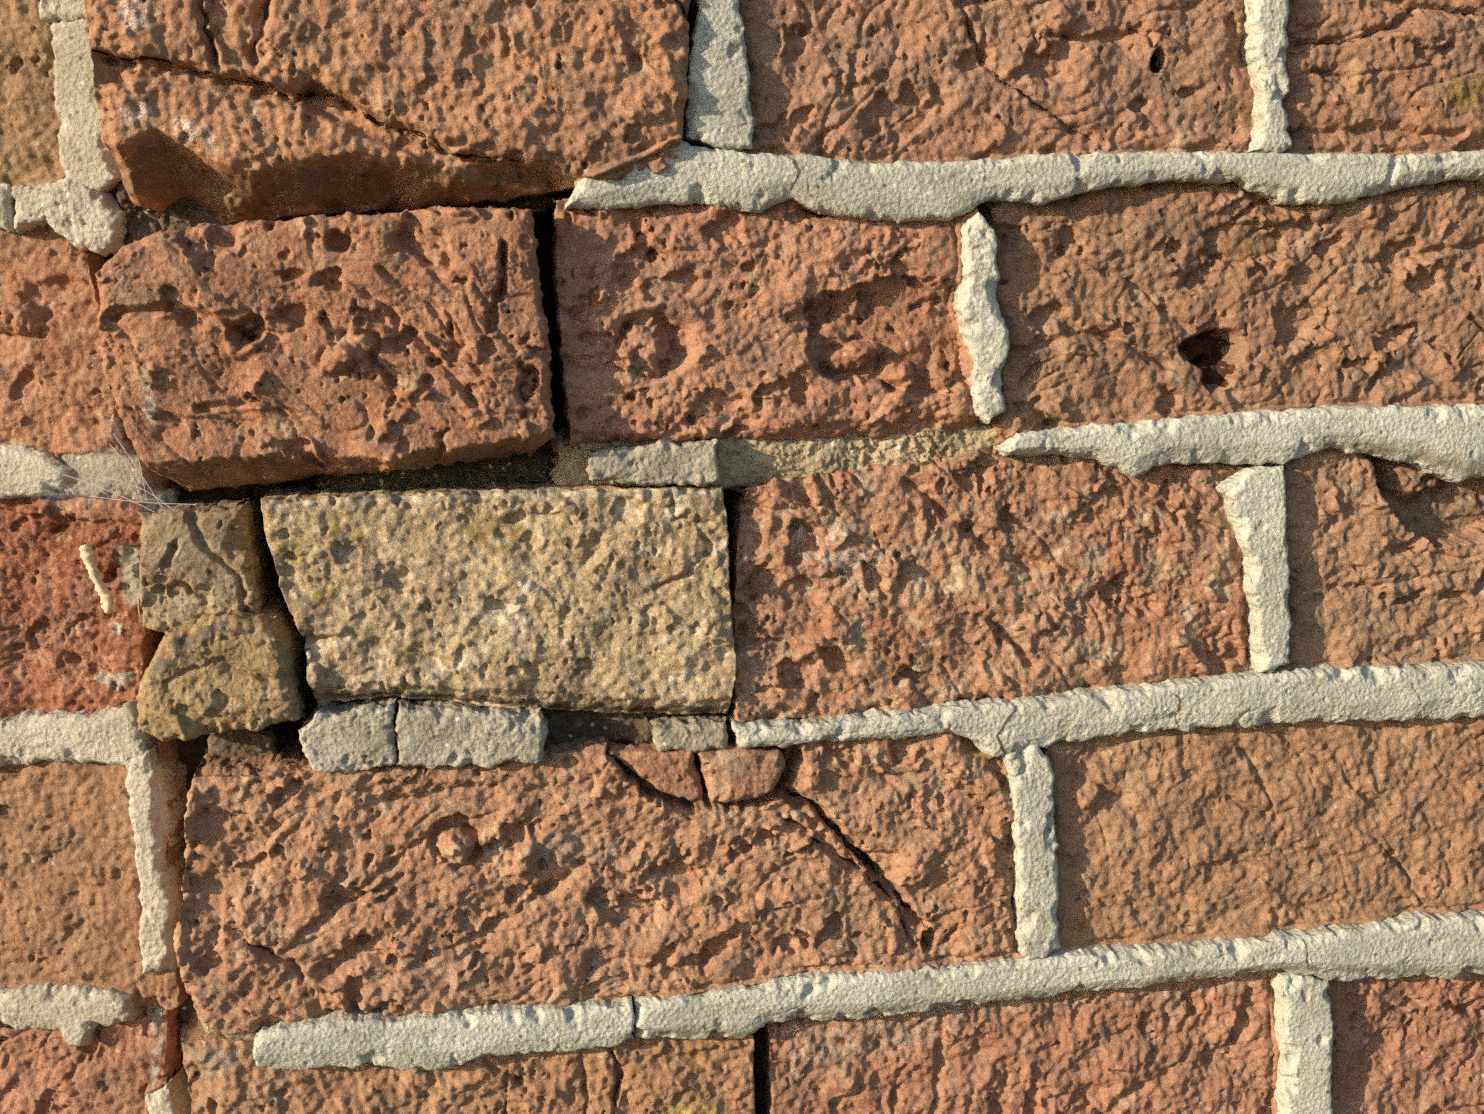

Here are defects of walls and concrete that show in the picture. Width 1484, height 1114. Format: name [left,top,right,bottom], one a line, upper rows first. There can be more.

crack [92,0,519,162]
crack [552,313,566,429]
crack [160,475,319,598]
crack [176,734,210,790]
crack [279,697,348,737]
crack [611,738,638,746]
crack [693,730,733,794]
crack [779,747,928,946]
crack [582,1047,620,1114]